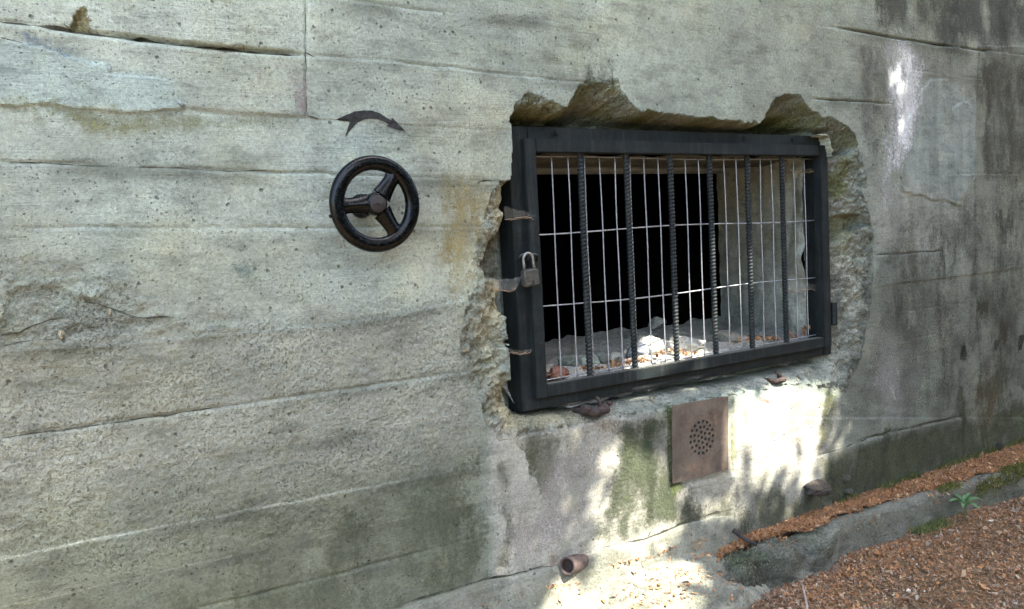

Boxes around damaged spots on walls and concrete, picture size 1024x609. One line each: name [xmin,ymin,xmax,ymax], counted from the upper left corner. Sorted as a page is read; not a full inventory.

crack [0,13,316,62]
water stain [862,43,923,171]
water stain [877,0,1024,181]
crack [2,317,64,346]
crack [84,298,170,319]
spalling [459,76,874,440]
water stain [873,206,1024,450]
water stain [605,442,656,520]